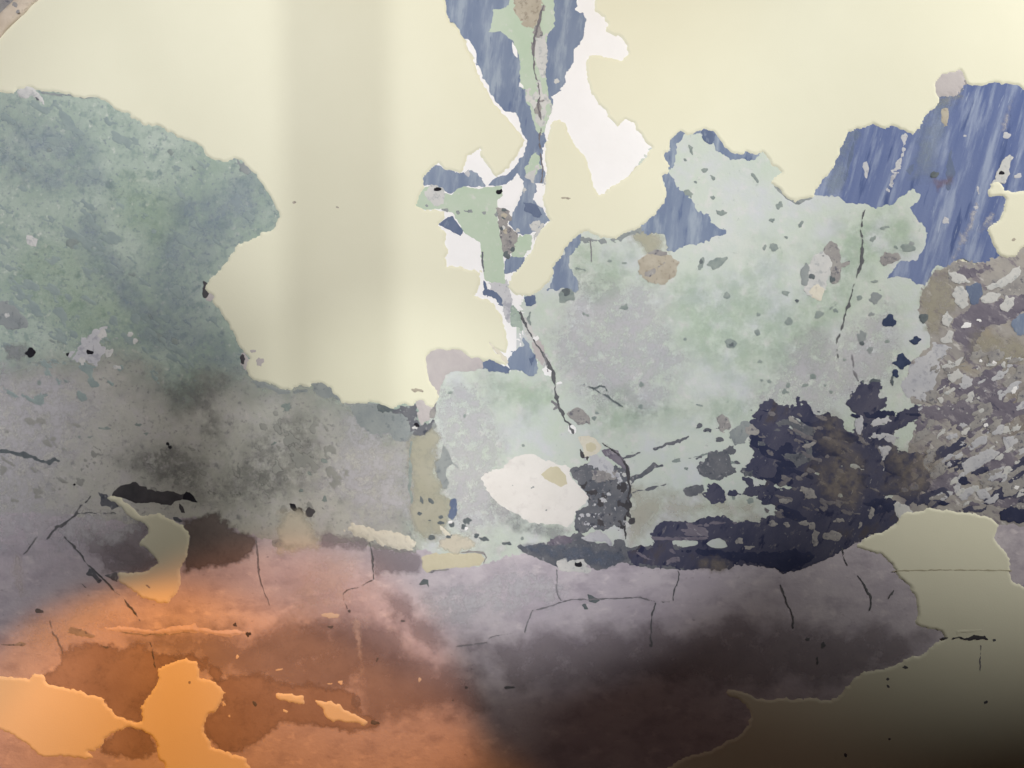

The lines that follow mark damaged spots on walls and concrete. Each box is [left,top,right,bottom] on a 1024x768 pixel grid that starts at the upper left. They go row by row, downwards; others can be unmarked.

peeling [416,0,652,395]
peeling [0,86,416,553]
crack [519,311,576,434]
peeling [429,70,1024,587]
crack [836,210,865,381]
crack [23,496,156,667]
damp [278,511,317,552]
damp [408,430,489,541]
peeling [0,511,944,768]
crack [456,569,680,647]